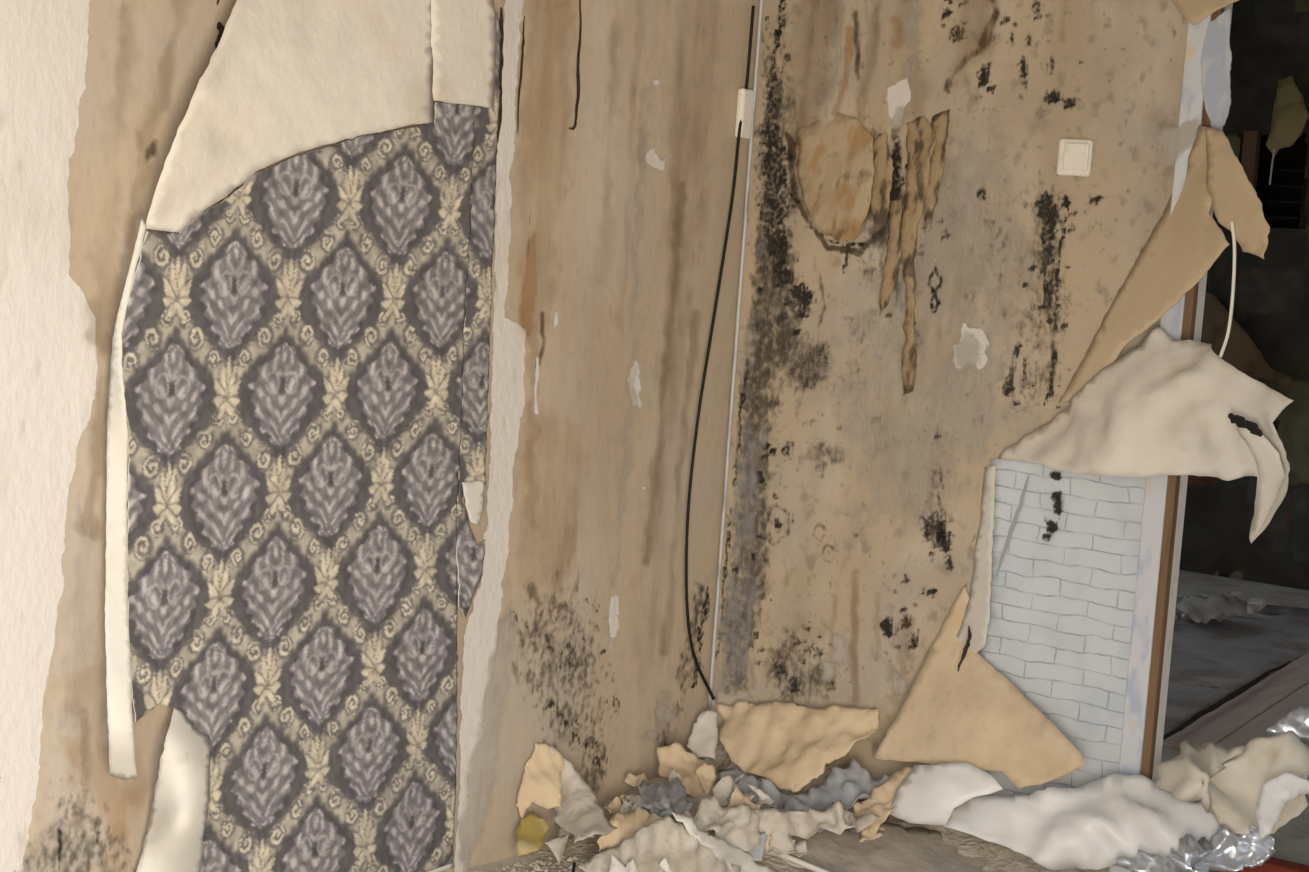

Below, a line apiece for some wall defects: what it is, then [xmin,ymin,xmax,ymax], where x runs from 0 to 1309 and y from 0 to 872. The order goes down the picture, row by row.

water stain [942,0,1041,93]
water stain [1044,57,1075,110]
peeling [1159,9,1232,164]
water stain [918,147,999,316]
water stain [678,0,908,695]
flaking render [0,0,98,872]
water stain [510,601,606,685]
water stain [546,700,606,790]